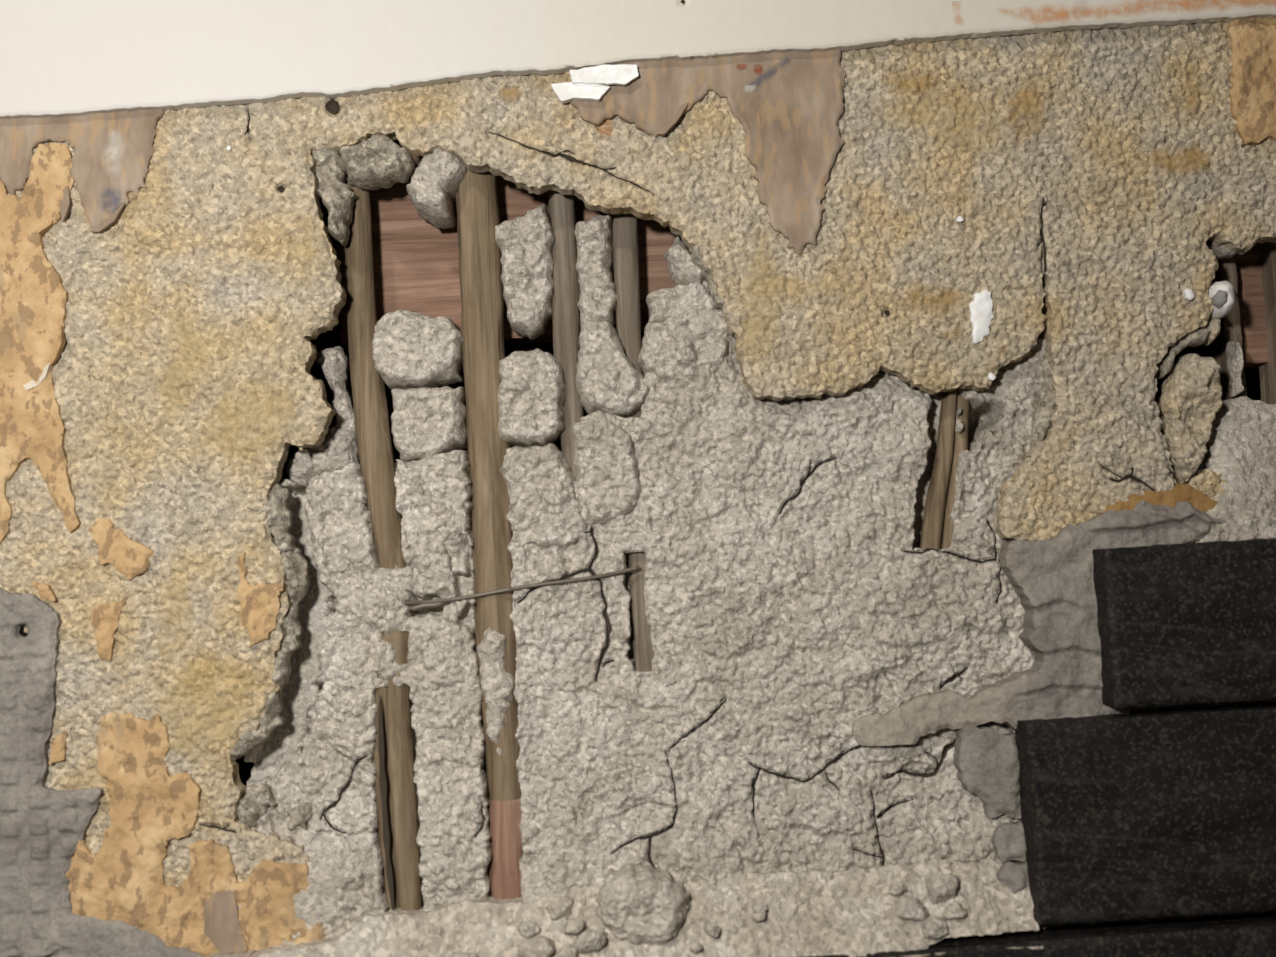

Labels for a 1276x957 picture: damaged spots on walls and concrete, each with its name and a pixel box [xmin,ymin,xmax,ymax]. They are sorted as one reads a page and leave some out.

flaking render [311,134,415,246]
crack [489,132,654,195]
peeling [551,49,845,255]
peeling [0,109,165,580]
flaking render [1156,320,1212,379]
crack [779,457,836,514]
flaking render [229,484,310,760]
crack [517,529,613,681]
peeling [49,733,68,764]
crack [610,698,727,869]
crack [748,745,861,837]
crack [853,742,955,866]